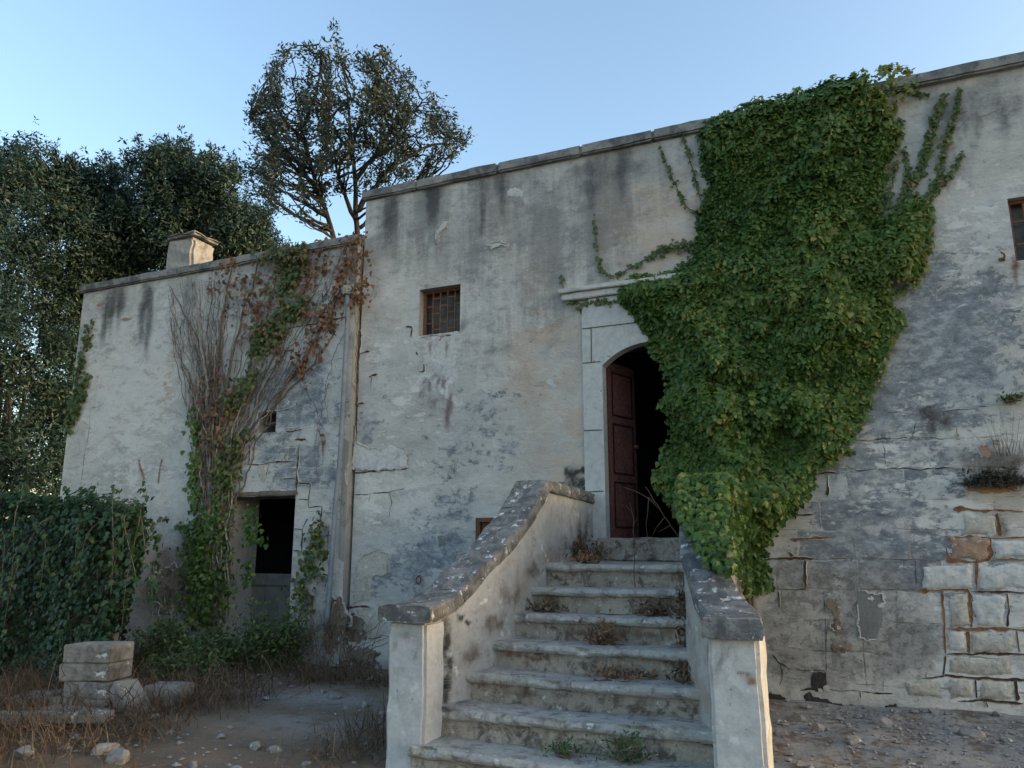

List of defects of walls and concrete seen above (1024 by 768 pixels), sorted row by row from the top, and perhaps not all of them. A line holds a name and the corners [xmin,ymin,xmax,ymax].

damp [140,291,152,345]
crack [248,382,334,589]
crack [285,317,407,520]
spalling [825,590,886,656]
crack [766,425,950,699]
crack [875,505,1024,707]
spalling [905,514,1024,705]